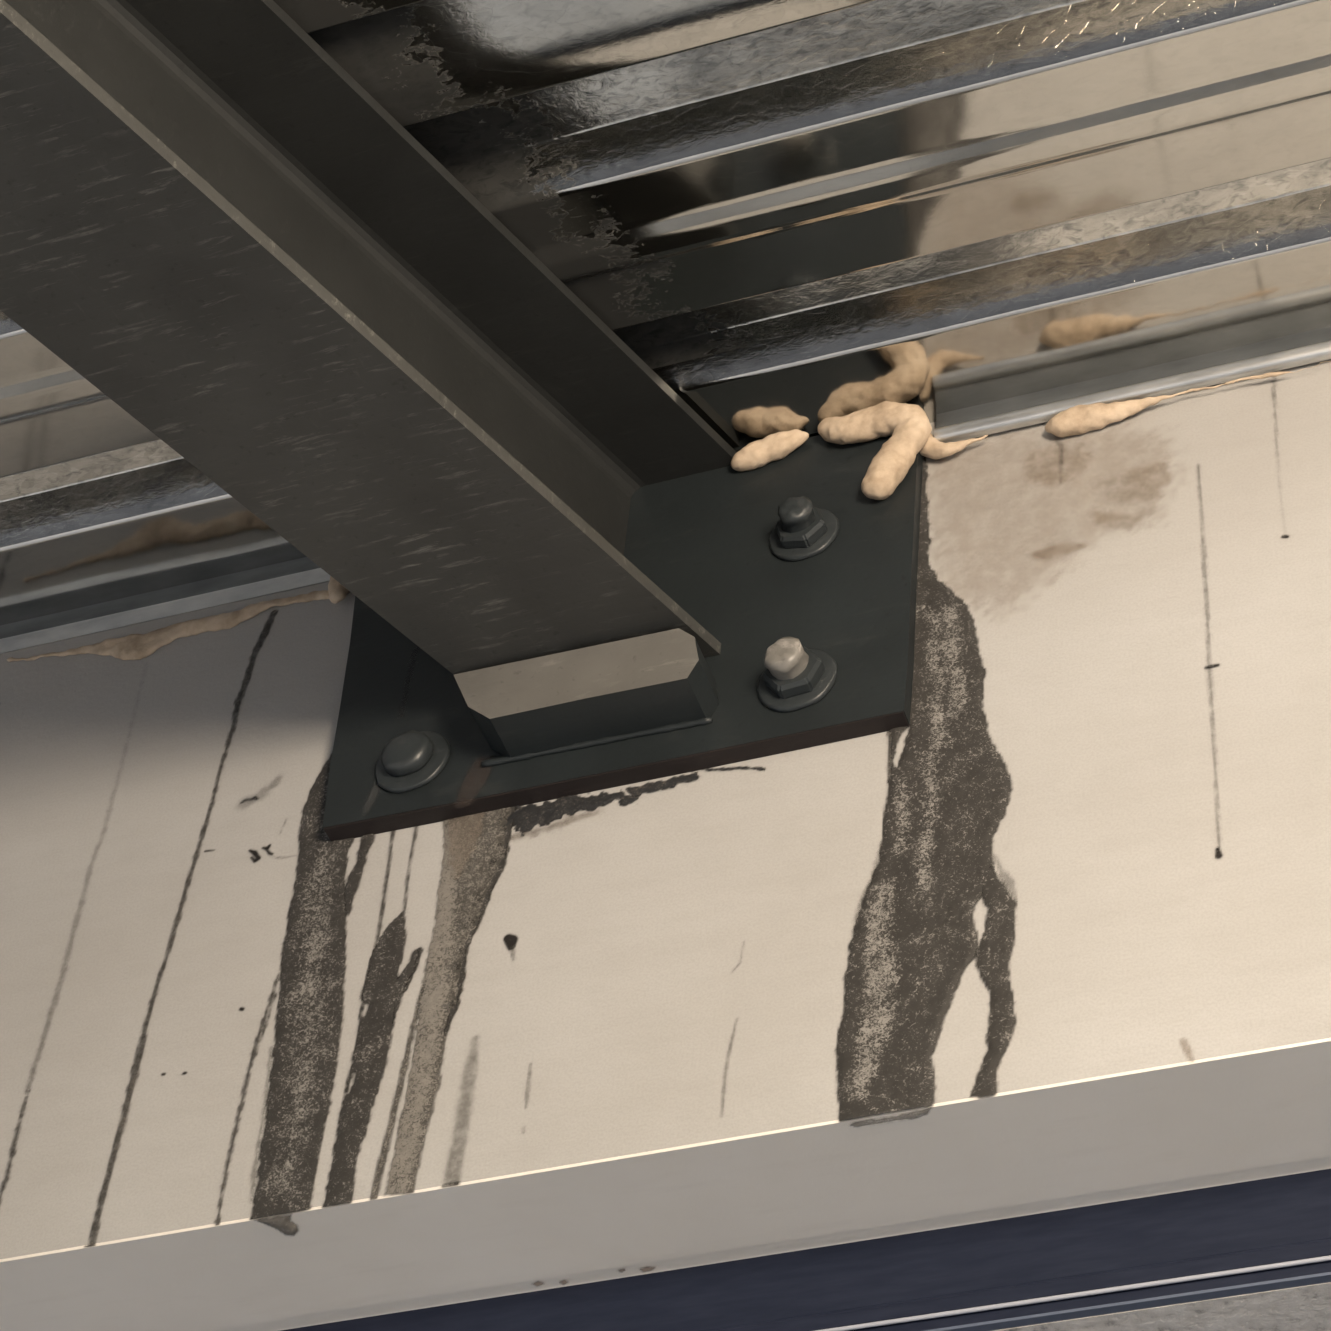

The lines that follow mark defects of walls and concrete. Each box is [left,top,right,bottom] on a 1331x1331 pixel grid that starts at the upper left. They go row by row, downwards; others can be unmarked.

water stain [250,754,406,1220]
water stain [385,806,517,1195]
water stain [836,456,1012,1122]
crack [1214,847,1222,858]